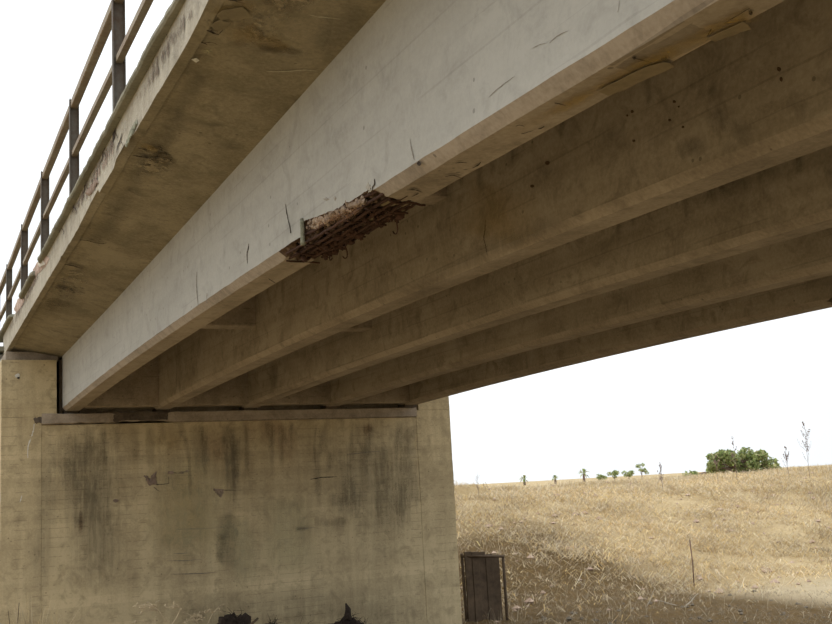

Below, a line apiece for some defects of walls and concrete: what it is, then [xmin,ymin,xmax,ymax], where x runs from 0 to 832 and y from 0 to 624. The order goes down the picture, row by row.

spalling [285,179,426,264]